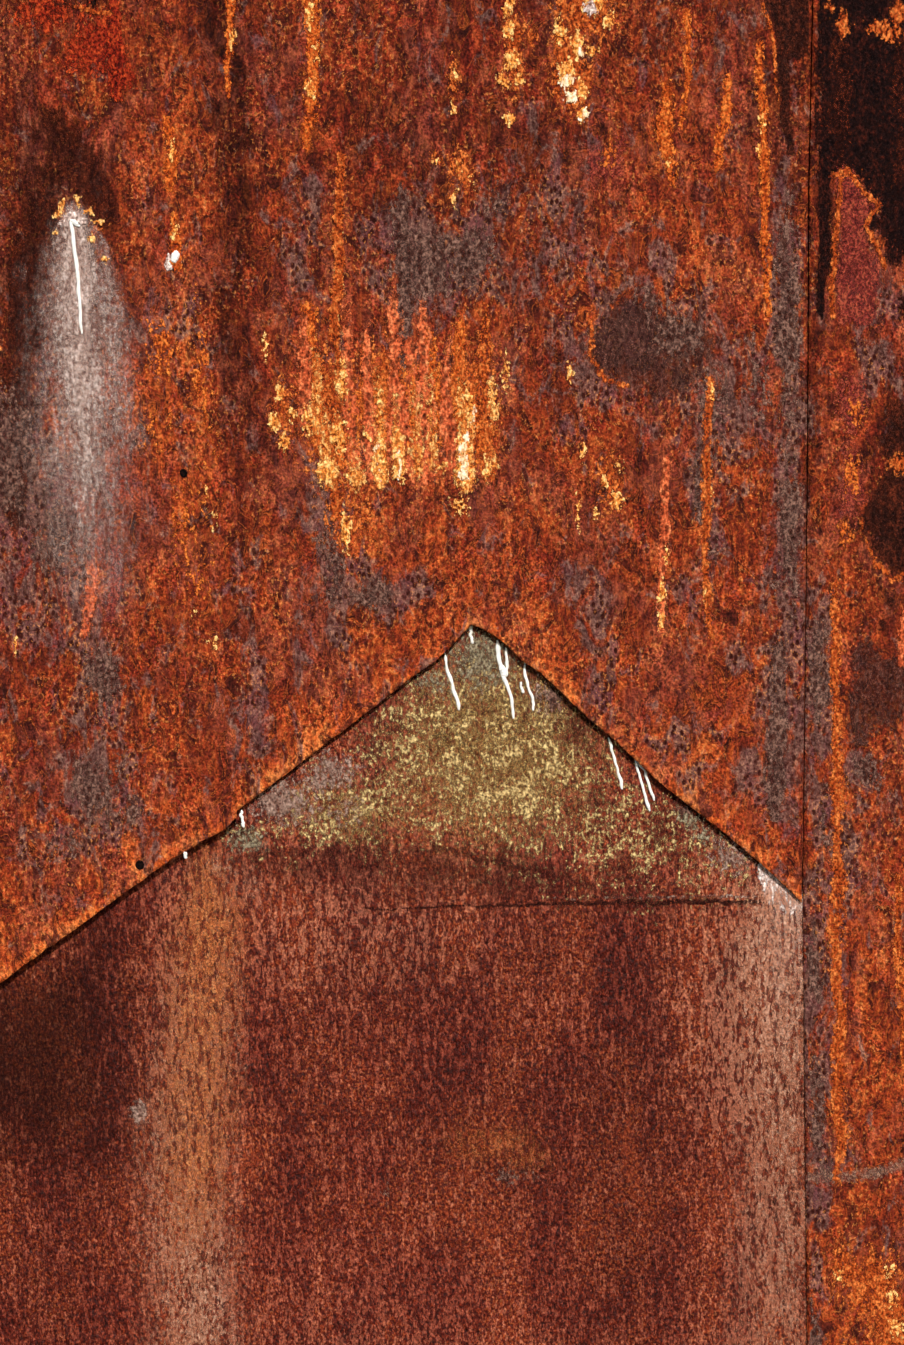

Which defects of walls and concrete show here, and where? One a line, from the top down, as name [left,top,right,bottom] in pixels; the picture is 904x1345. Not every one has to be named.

damp [29,0,99,24]
rust [825,171,838,237]
rust [834,217,844,285]
rust [864,230,879,260]
rust [871,228,898,257]
damp [58,211,99,459]
damp [579,0,904,822]
rust [184,881,225,1015]
rust [826,589,851,1184]
rust [892,872,904,1069]